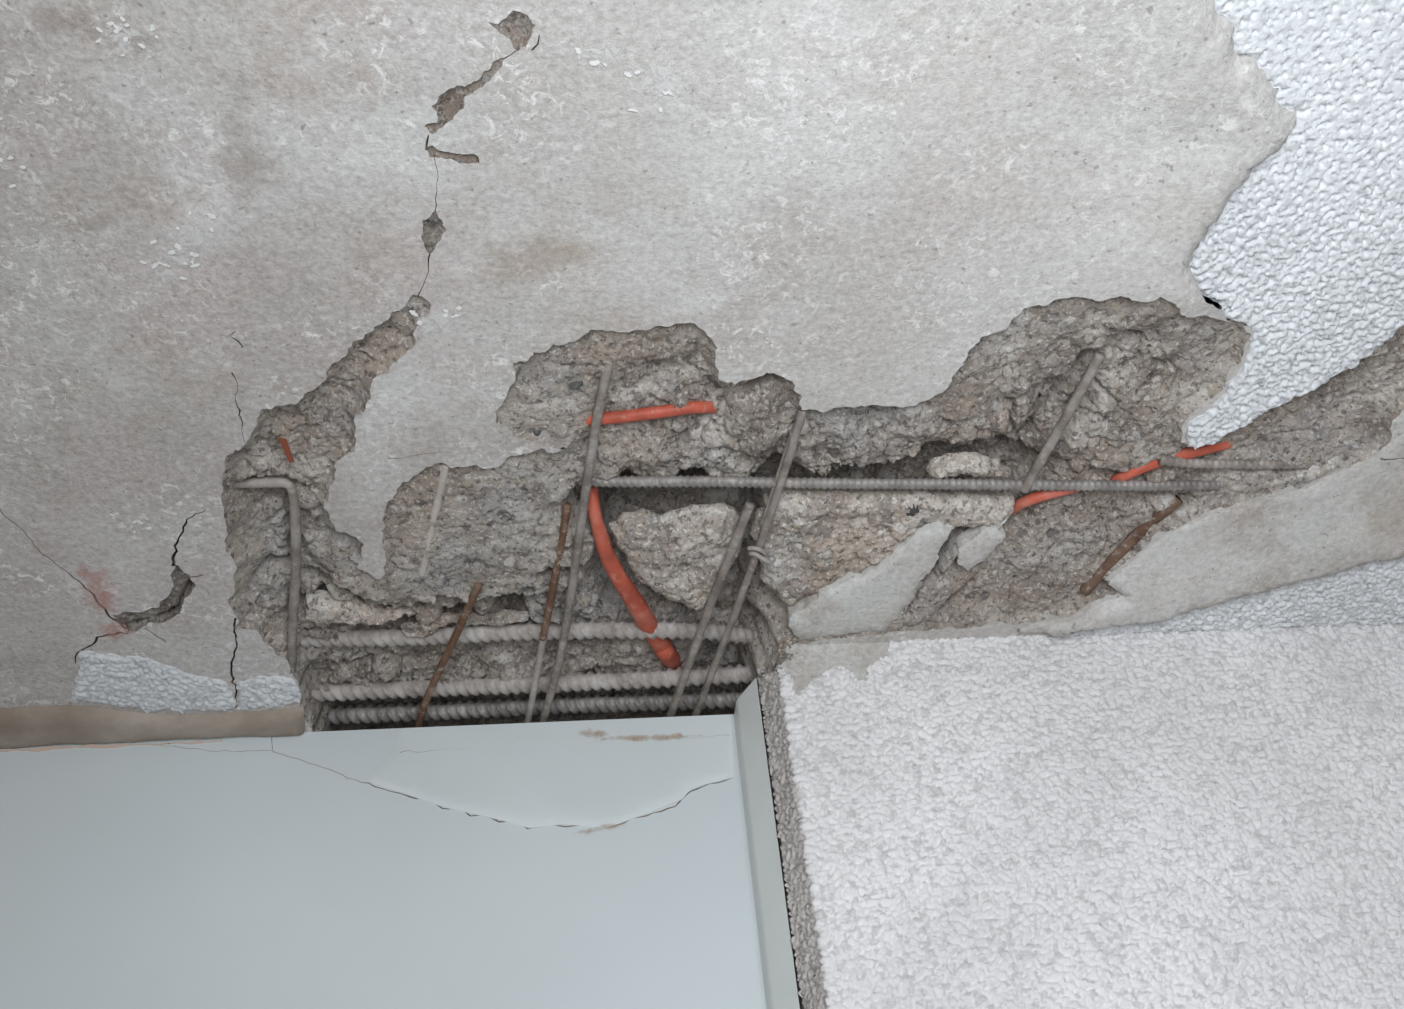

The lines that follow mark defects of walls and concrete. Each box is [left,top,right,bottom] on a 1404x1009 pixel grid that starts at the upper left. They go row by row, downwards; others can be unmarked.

crack [416,10,540,297]
spalling [72,0,1404,732]
crack [0,509,167,662]
crack [171,510,206,578]
crack [230,618,238,700]